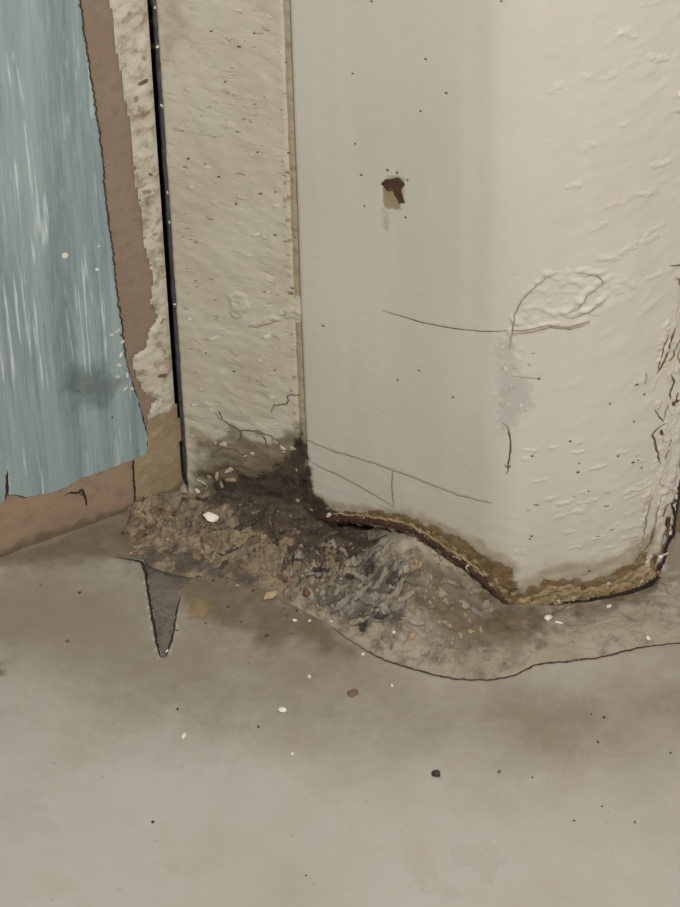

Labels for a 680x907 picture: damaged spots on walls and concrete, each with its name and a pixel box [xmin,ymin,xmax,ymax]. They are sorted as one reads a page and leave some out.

spalling [78,0,134,391]
crack [385,311,589,332]
crack [217,411,284,456]
crack [307,439,492,508]
water stain [0,433,544,649]
crack [659,479,680,571]
peeling [359,611,395,649]
flaking render [361,533,497,640]
flaking render [513,602,571,624]